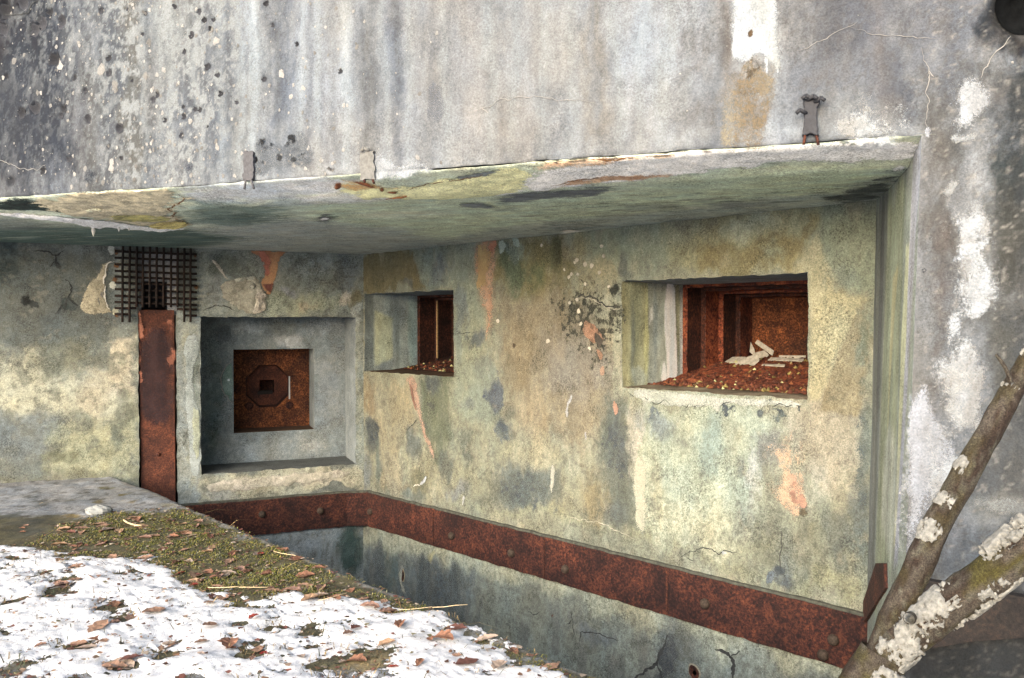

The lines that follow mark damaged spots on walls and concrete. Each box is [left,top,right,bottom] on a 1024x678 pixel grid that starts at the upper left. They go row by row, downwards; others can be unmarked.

crack [798,25,937,127]
water stain [951,80,990,143]
water stain [0,197,183,237]
corrosion [334,180,406,200]
water stain [943,180,959,198]
spalling [80,261,111,315]
spalling [220,276,268,314]
corrosion [474,240,496,336]
corrosion [166,319,176,365]
peeling [568,298,605,375]
corrosion [406,376,434,456]
corrosion [768,438,807,517]